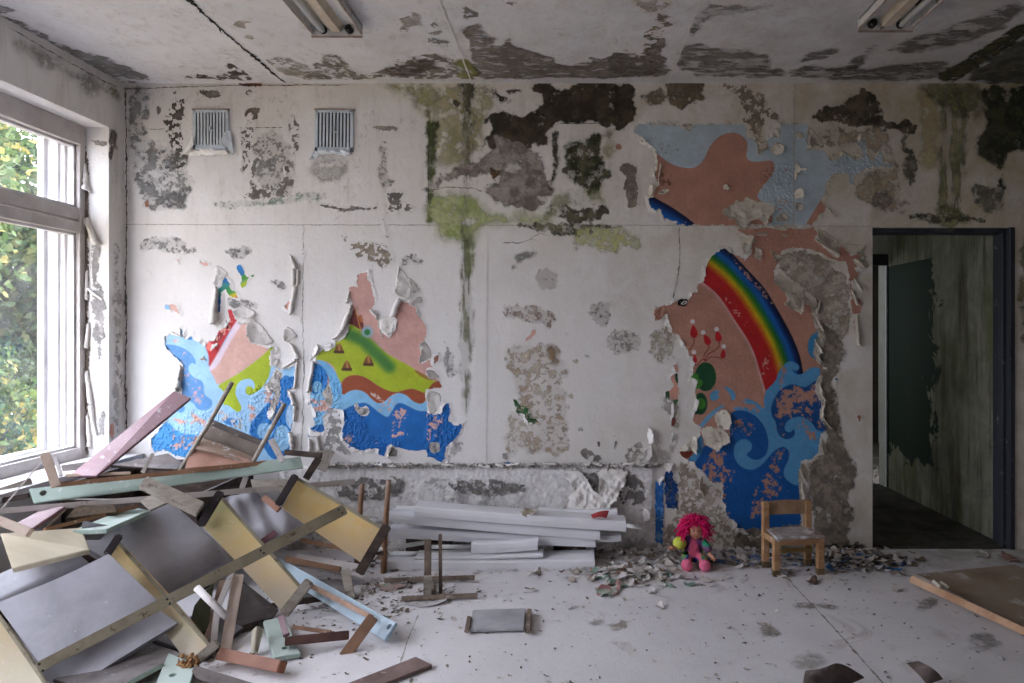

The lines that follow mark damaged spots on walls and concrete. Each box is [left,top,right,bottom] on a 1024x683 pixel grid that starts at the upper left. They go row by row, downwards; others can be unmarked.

crack [9,0,339,450]
damp [443,347,470,404]
damp [460,235,472,359]
peeling [147,63,896,549]
spalling [632,0,674,59]
damp [436,5,1024,237]